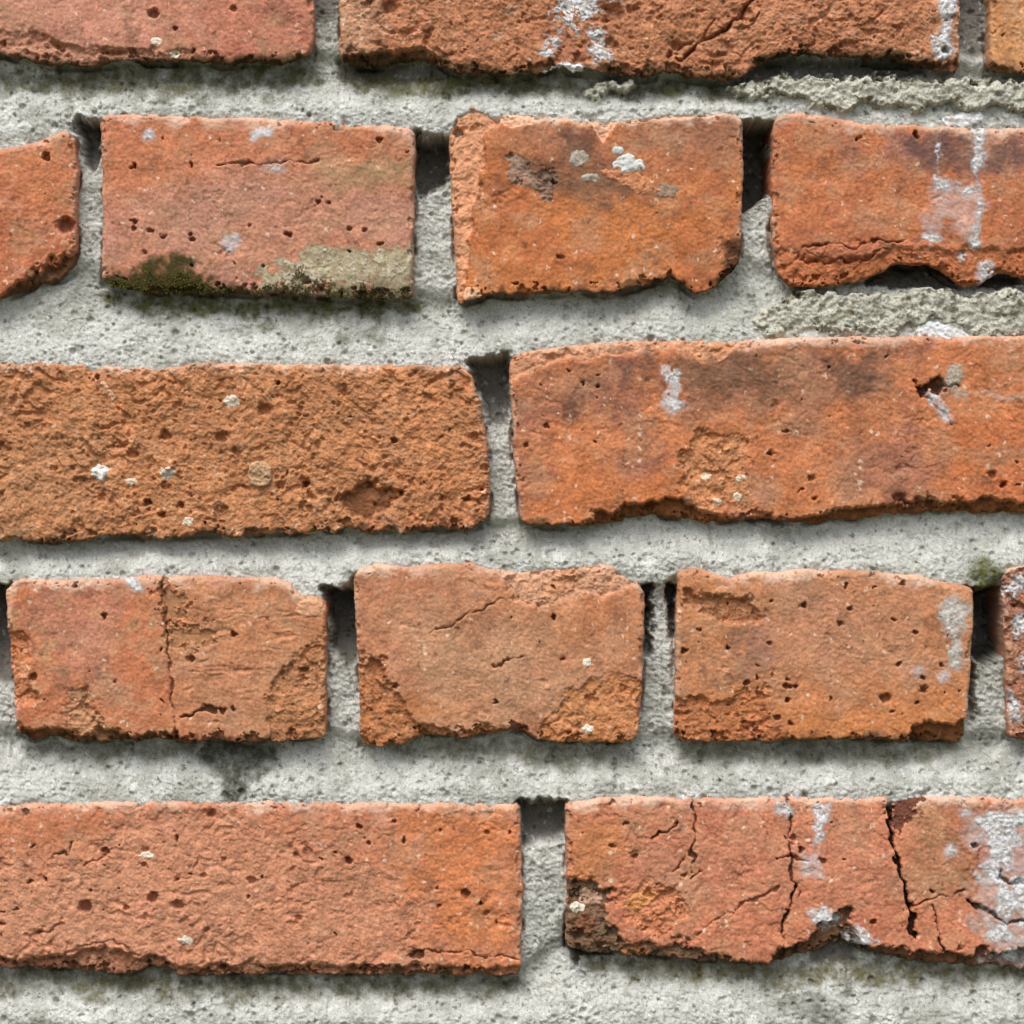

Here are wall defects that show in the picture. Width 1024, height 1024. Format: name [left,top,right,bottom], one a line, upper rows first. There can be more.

damp [540,0,614,73]
damp [931,0,958,61]
damp [104,254,251,295]
crack [149,577,226,737]
spalling [565,877,720,962]
crack [651,799,701,885]
crack [697,797,804,947]
damp [808,906,839,929]
damp [844,926,880,945]
crack [883,796,945,952]
crack [956,889,1019,923]
damp [961,809,1024,960]